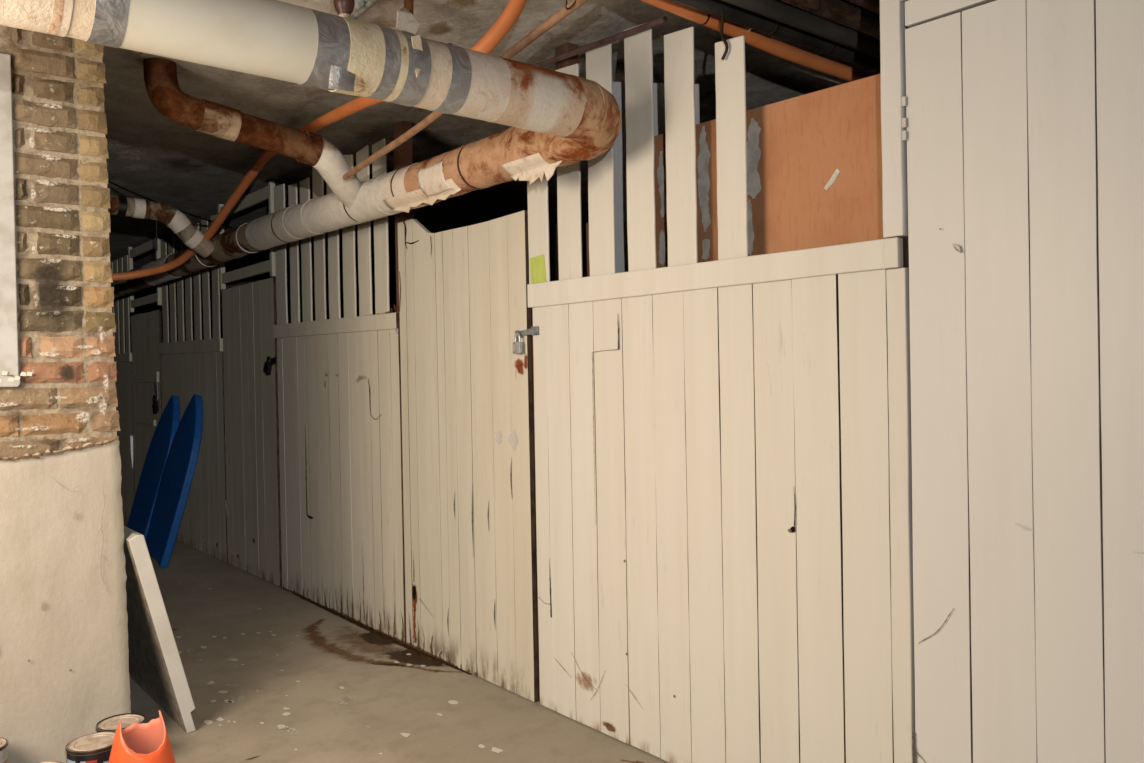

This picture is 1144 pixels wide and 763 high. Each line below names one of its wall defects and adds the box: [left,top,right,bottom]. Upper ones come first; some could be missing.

corrosion [515,355,527,374]
leakage [279,569,478,677]